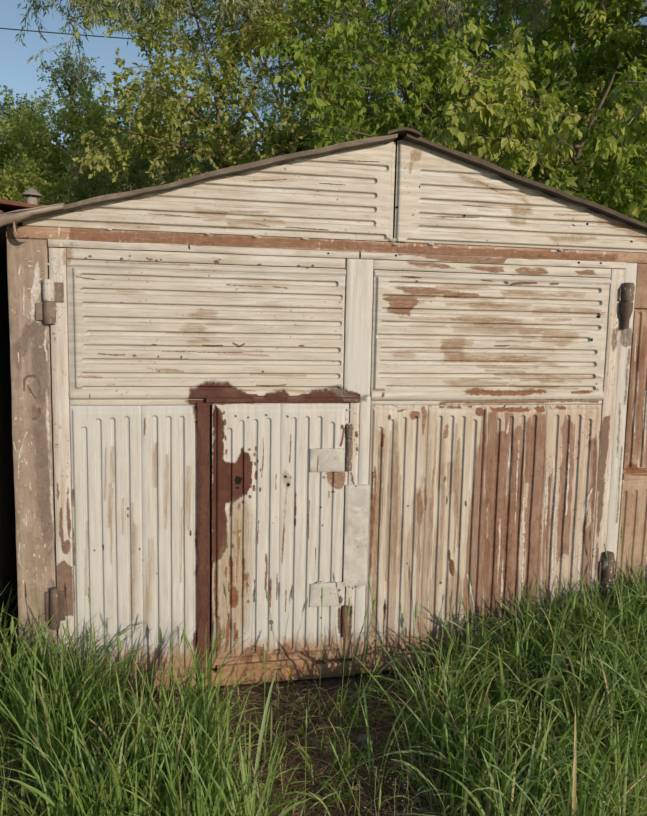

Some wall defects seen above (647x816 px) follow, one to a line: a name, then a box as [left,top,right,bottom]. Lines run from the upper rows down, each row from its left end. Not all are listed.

corrosion [69,229,617,275]
corrosion [383,287,505,316]
corrosion [440,339,598,405]
peeling [323,471,357,495]
corrosion [370,469,402,586]
corrosion [417,457,443,524]
corrosion [481,422,552,644]
corrosion [582,416,610,586]
corrosion [626,463,647,476]
corrosion [212,522,293,651]
peeling [314,581,363,640]
corrosion [240,643,315,665]